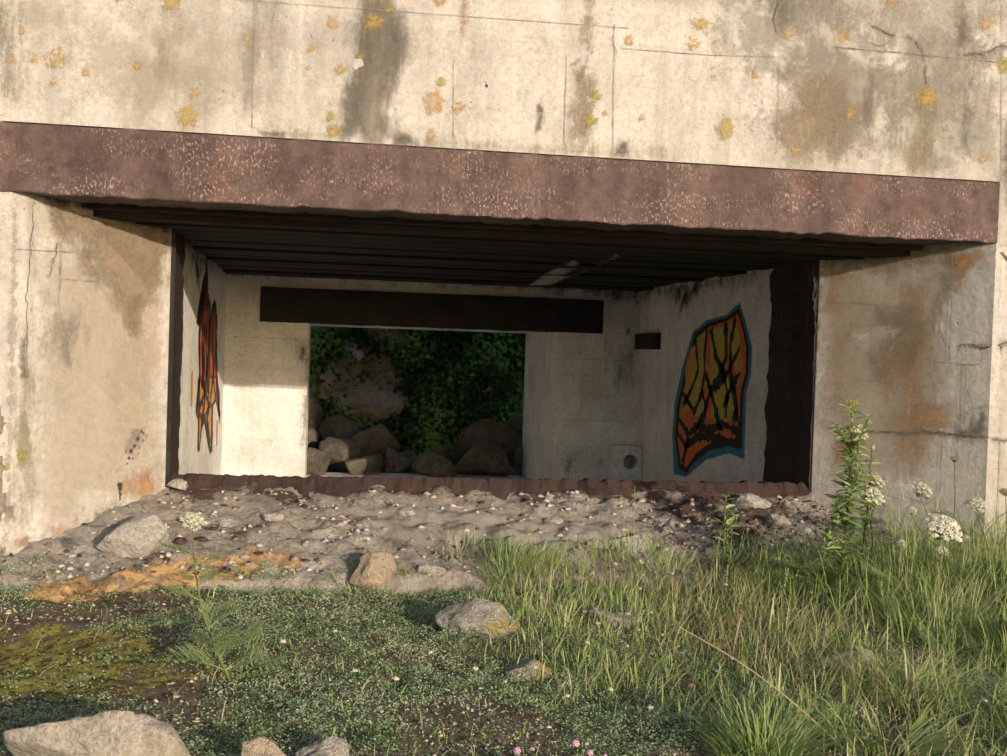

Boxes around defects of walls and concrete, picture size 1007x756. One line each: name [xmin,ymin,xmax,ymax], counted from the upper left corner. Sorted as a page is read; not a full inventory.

damp [341,0,412,145]
damp [572,63,594,155]
damp [739,0,1005,168]
crack [25,201,62,368]
spalling [528,260,588,285]
corrosion [860,249,982,309]